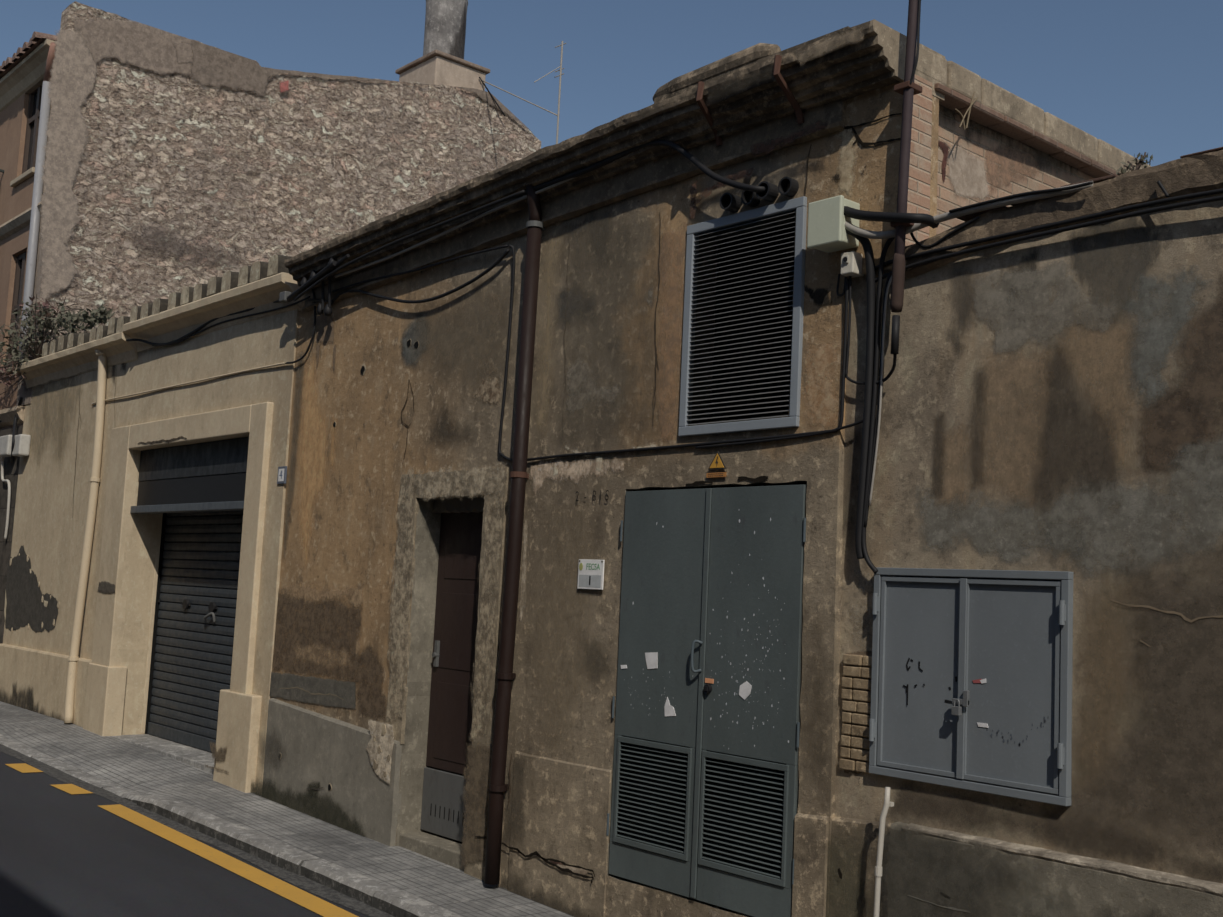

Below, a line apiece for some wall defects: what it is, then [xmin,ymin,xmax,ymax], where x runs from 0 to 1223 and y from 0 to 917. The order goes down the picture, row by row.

crack [844,113,901,147]
leakage [933,216,1223,504]
peeling [4,545,60,633]
crack [1111,600,1223,623]
spalling [272,463,508,866]
leakage [883,561,1223,917]
crack [475,836,595,884]